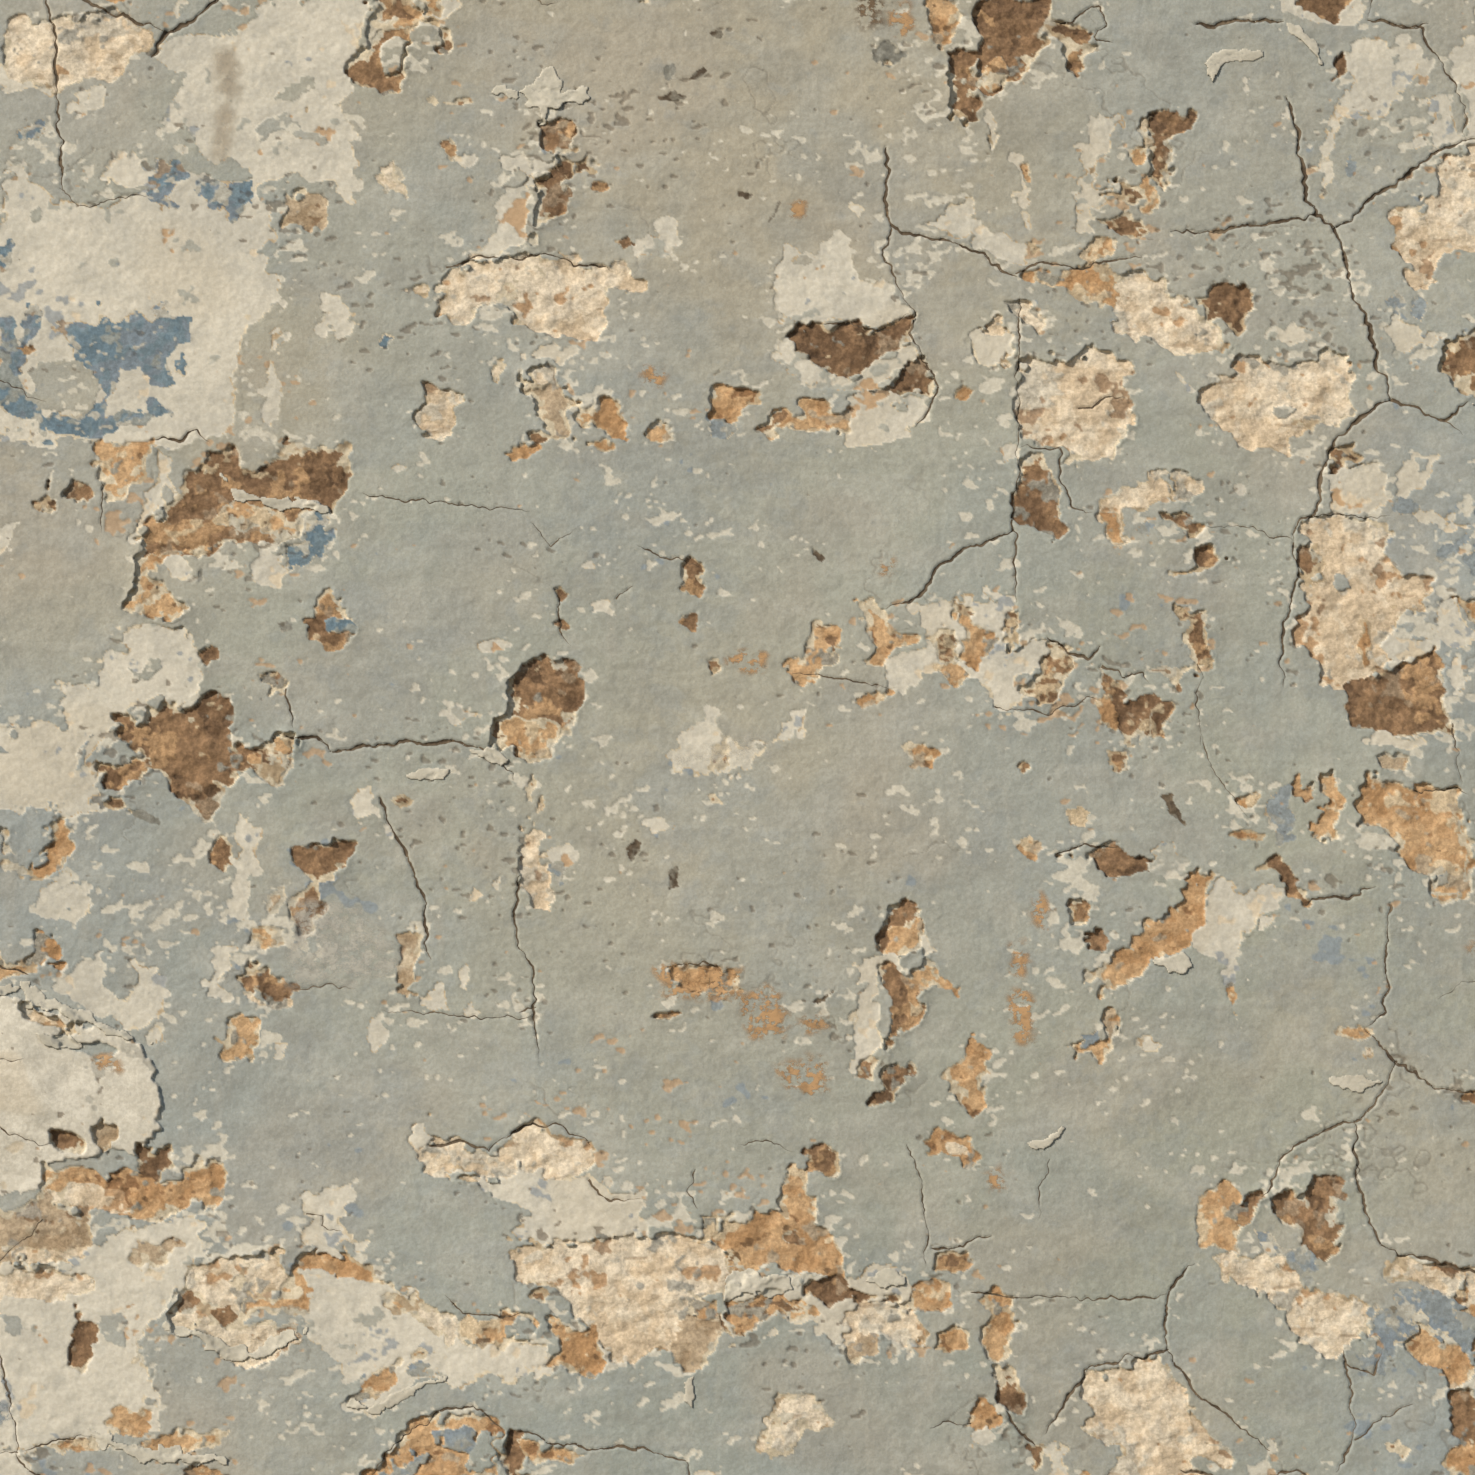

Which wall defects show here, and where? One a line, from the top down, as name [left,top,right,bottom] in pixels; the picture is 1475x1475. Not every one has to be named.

crack [45,0,219,207]
peeling [0,0,465,1063]
spalling [401,66,683,462]
peeling [707,230,935,448]
crack [826,147,1090,608]
spalling [923,0,1357,540]
crack [1170,0,1475,681]
spalling [1291,443,1475,904]
crack [380,797,431,959]
crack [1262,904,1475,1273]
peeling [0,1114,1028,1475]
crack [971,1264,1412,1475]